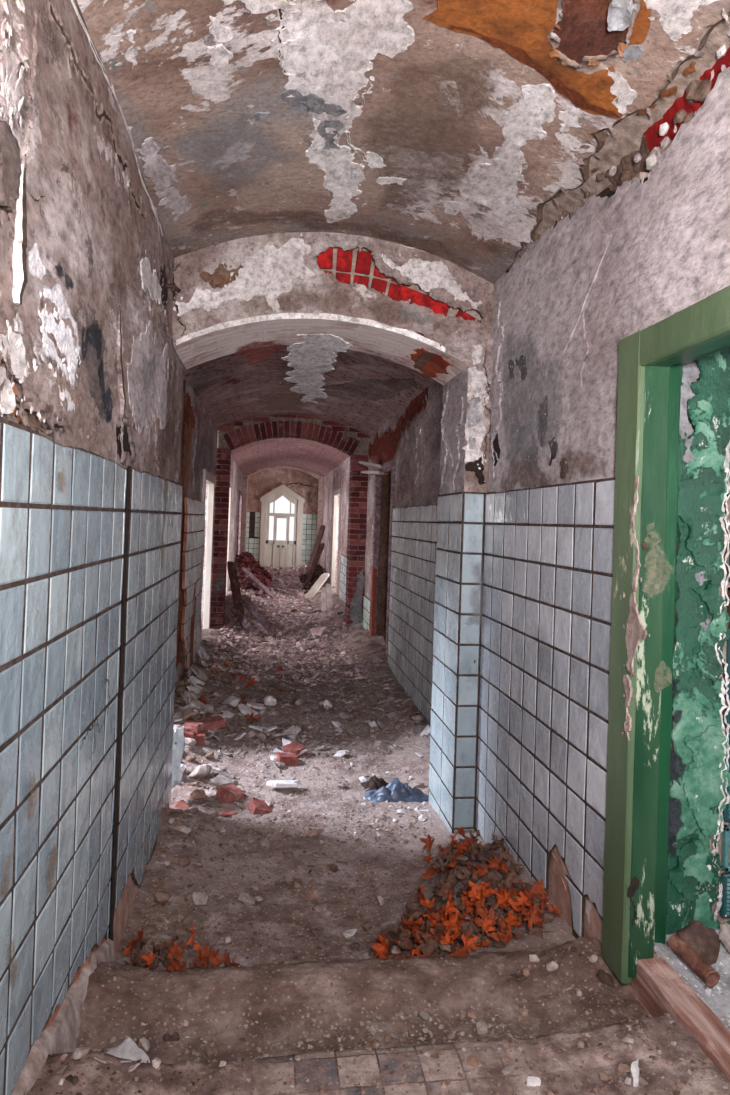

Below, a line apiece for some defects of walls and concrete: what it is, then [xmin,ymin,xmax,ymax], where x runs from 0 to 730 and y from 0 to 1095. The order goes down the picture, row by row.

peeling [0,0,30,130]
crack [10,0,163,236]
peeling [222,0,415,223]
peeling [439,83,581,231]
flaking render [549,0,730,114]
damp [28,243,113,423]
flaking render [0,164,169,460]
peeling [140,233,482,323]
peeling [280,328,501,485]
peeling [621,477,672,741]
peeling [677,361,730,686]
peeling [668,725,730,904]